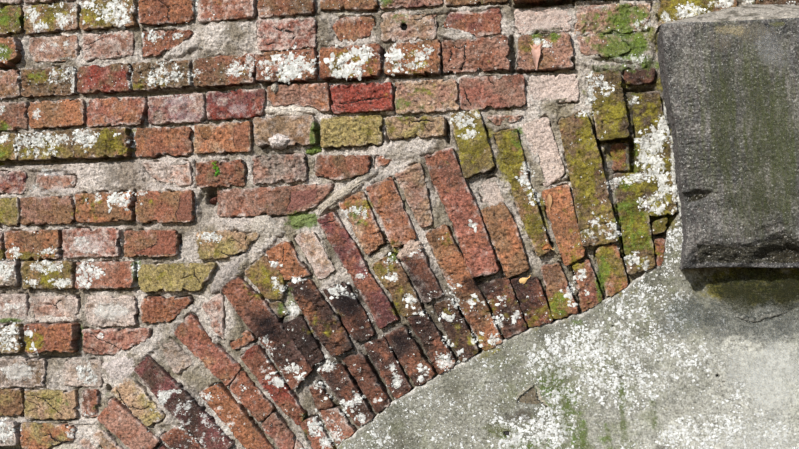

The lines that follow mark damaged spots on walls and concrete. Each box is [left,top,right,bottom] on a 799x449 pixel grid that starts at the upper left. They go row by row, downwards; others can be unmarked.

water stain [667,267,799,334]
flaking render [516,385,549,407]